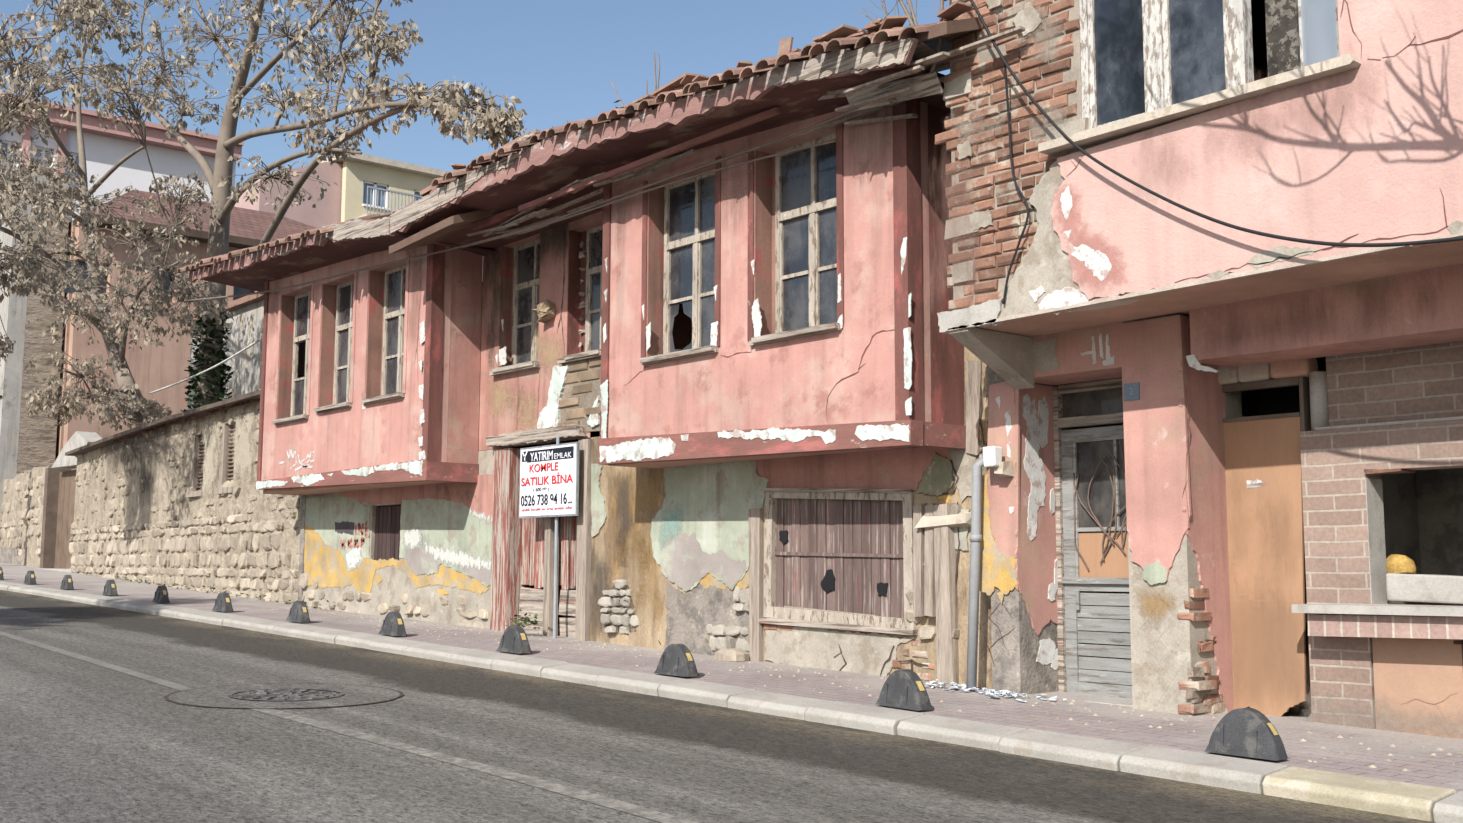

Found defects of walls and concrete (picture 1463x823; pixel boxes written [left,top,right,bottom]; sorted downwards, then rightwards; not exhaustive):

crack [1340,0,1463,60]
flaking render [935,0,1463,331]
flaking render [69,321,491,628]
peeling [537,241,689,486]
peeling [752,298,762,337]
peeling [718,427,836,444]
crack [826,329,894,421]
peeling [855,293,912,442]
peeling [995,394,1055,540]
damp [591,470,681,630]
peeling [1036,638,1058,670]
spalling [1177,588,1228,716]